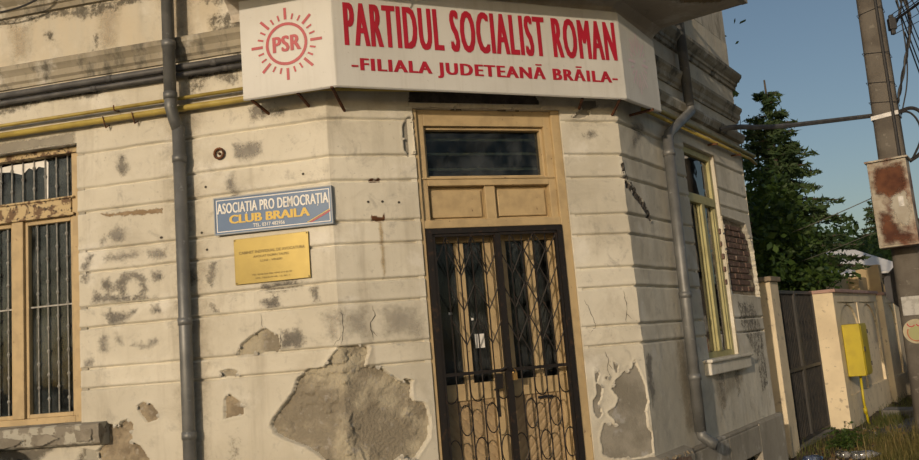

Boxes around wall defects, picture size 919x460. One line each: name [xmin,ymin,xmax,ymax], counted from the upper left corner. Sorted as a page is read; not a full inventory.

crack [620,162,652,223]
flaking render [238,327,302,356]
flaking render [136,402,160,422]
flaking render [226,394,246,418]
flaking render [274,344,429,460]
flaking render [593,354,655,459]
peeling [0,434,58,449]
flaking render [100,419,150,460]